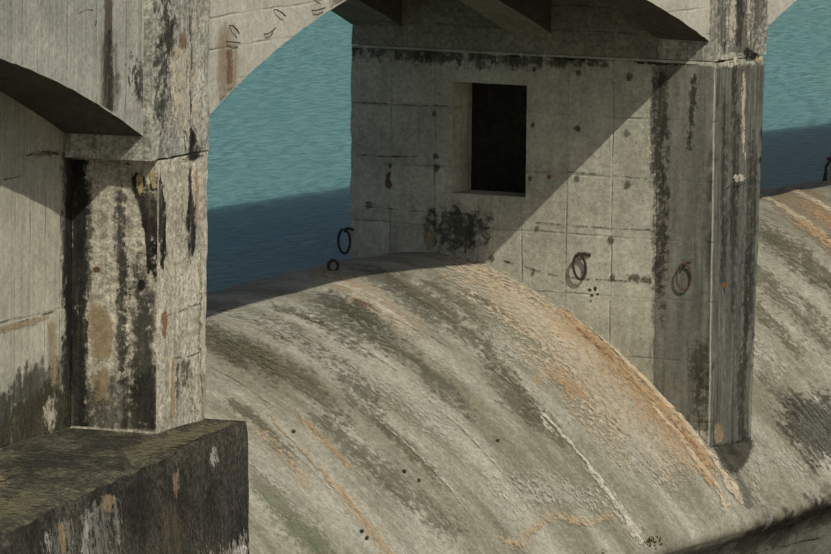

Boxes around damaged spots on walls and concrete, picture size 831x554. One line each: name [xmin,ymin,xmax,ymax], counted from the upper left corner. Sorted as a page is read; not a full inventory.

rust [219,32,237,100]
water stain [352,47,622,70]
water stain [717,0,768,55]
water stain [50,153,94,427]
water stain [113,172,175,420]
water stain [183,164,467,554]
water stain [424,205,494,256]
rust [436,254,744,510]
water stain [634,61,831,448]
rust [760,187,831,255]
water stain [524,399,644,544]
water stain [685,485,831,554]